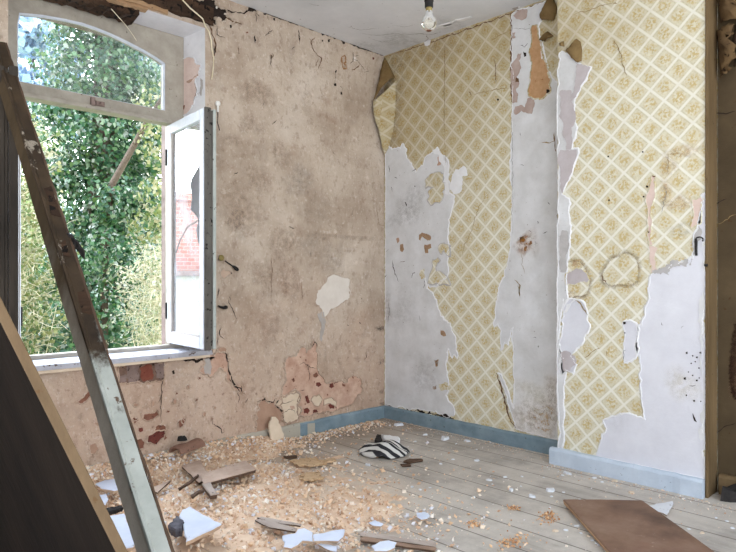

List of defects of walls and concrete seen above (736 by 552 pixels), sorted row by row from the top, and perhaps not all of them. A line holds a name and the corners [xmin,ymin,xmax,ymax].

peeling [183,56,203,116]
peeling [557,64,590,193]
peeling [433,148,467,195]
flaking render [117,362,175,385]
flaking render [254,273,363,432]
peeling [560,351,576,373]